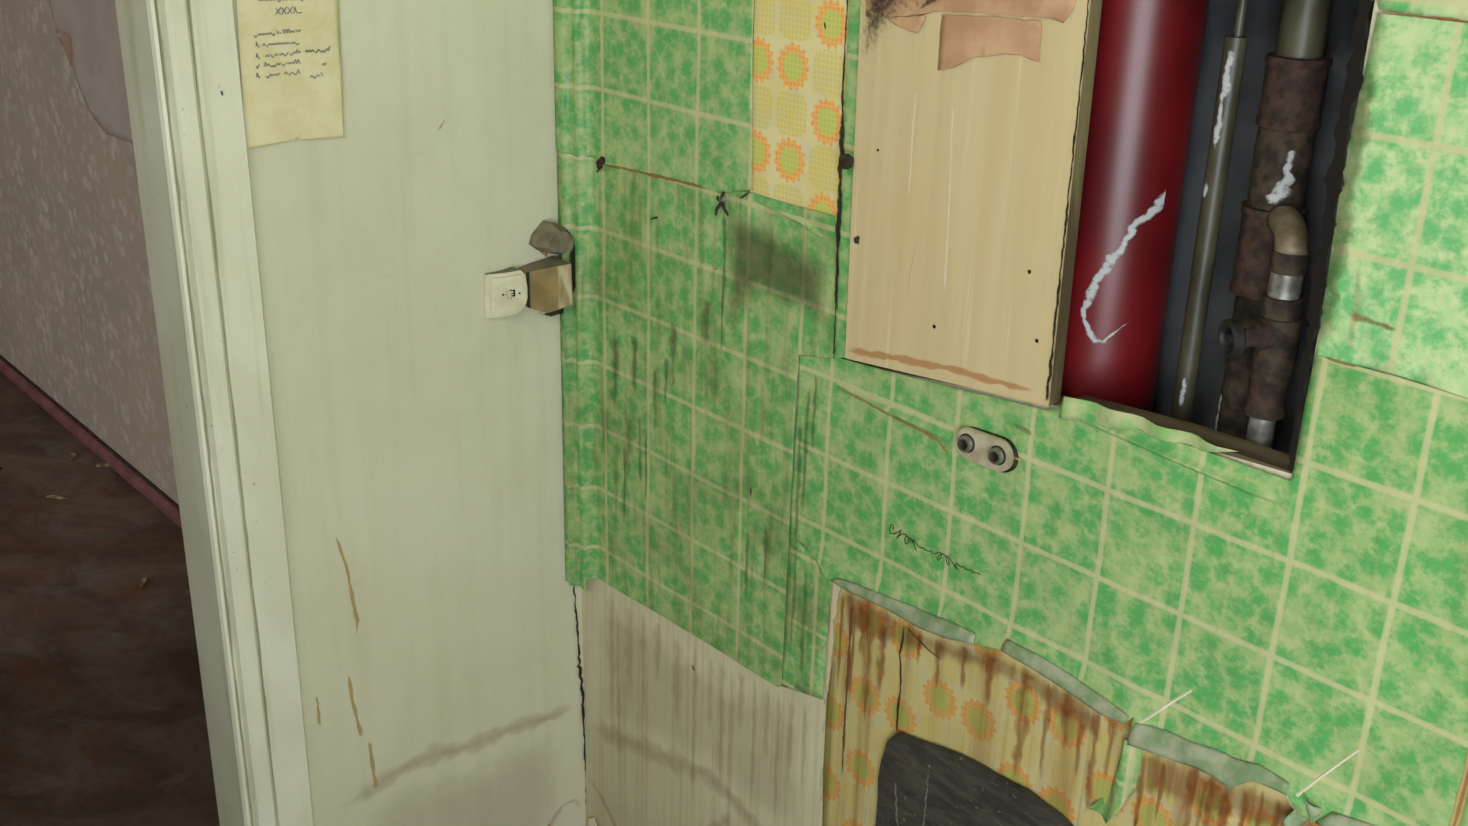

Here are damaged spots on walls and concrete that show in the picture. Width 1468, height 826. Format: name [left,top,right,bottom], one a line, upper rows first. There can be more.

peeling [50,0,133,142]
peeling [1214,51,1234,144]
leakage [833,0,848,358]
peeling [1267,151,1295,203]
leakage [721,223,814,343]
leakage [573,586,586,771]
peeling [825,583,841,704]
rust [1077,716,1114,796]
rust [1135,761,1164,826]
rust [1186,773,1280,826]
rust [1449,753,1468,826]